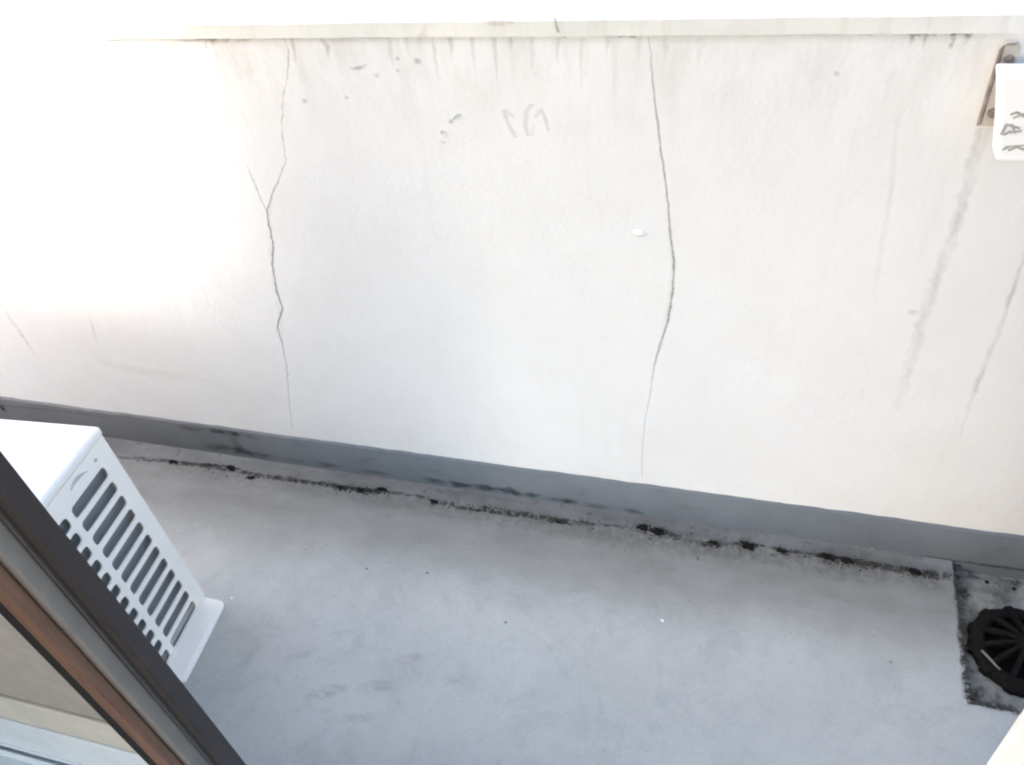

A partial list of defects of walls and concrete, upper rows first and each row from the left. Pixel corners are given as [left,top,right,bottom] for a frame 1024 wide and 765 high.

crack [267,208,283,323]
crack [660,225,675,343]
water stain [950,560,1020,714]